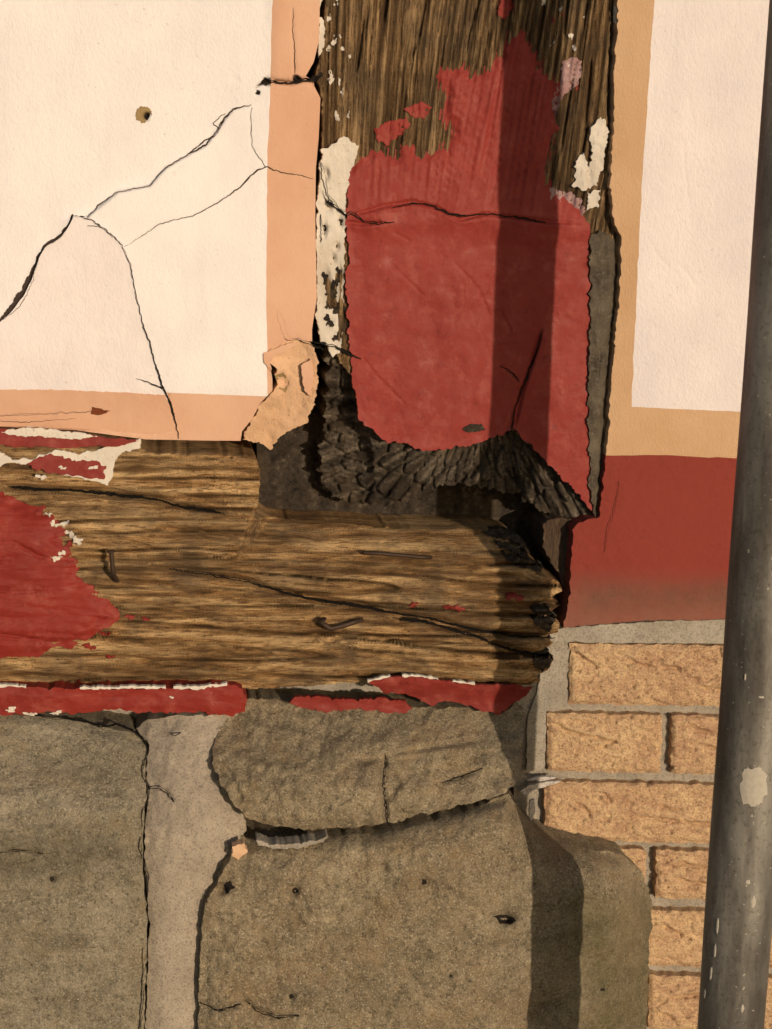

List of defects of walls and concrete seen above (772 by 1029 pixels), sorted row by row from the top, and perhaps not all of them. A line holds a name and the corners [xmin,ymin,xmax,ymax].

spalling [293,70,344,97]
peeling [552,33,591,122]
peeling [373,101,432,146]
peeling [549,187,586,216]
crack [0,15,546,439]
spalling [321,266,348,341]
spalling [241,339,319,450]
peeling [82,631,116,659]
peeling [5,706,62,716]
peeling [367,673,533,715]
crack [381,755,389,825]